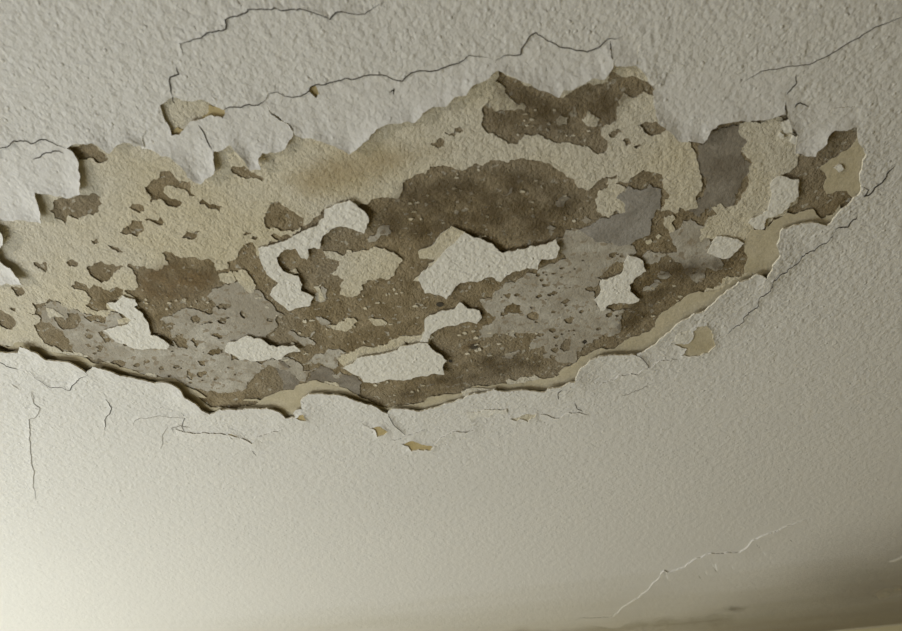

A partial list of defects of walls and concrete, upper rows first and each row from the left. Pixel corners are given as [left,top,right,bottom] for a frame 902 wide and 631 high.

crack [168,0,384,103]
peeling [0,32,865,457]
crack [1,363,87,500]
crack [97,399,288,457]